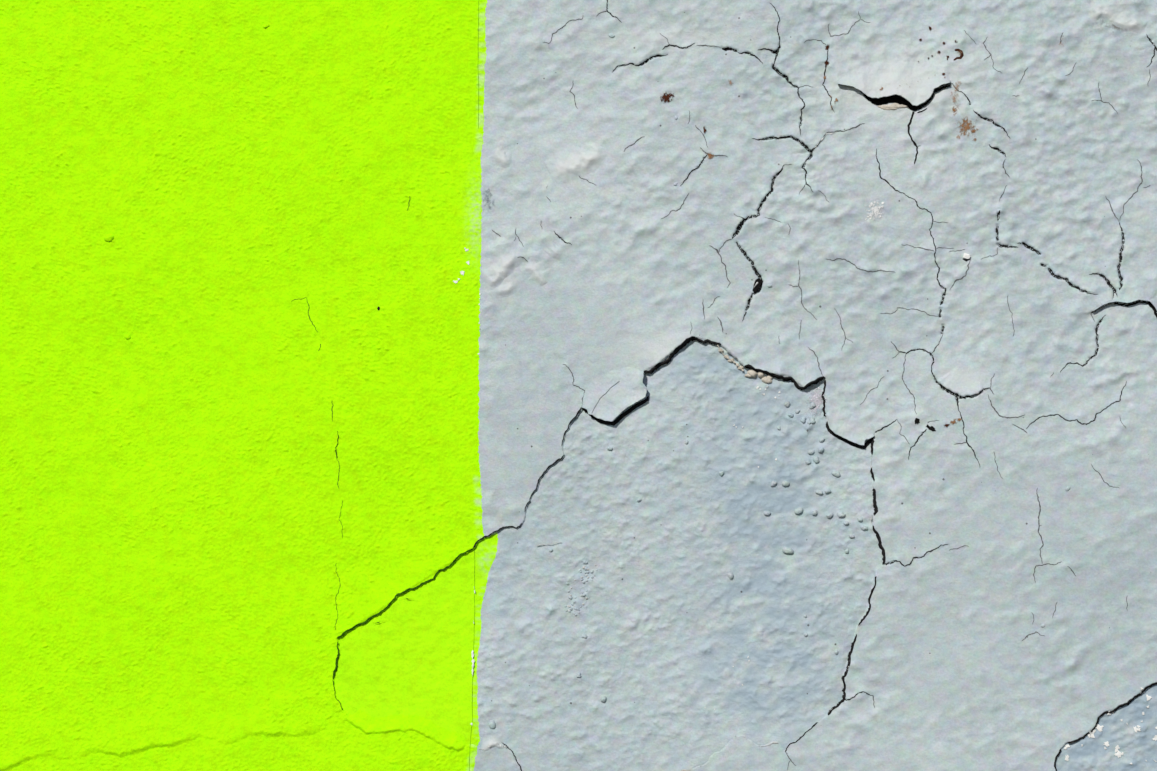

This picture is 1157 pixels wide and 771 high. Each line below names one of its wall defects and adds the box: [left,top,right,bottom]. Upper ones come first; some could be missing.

crack [474,74,482,129]
crack [545,0,622,44]
peeling [838,56,952,164]
crack [964,30,1028,96]
crack [613,3,870,374]
crack [827,83,1150,479]
spalling [333,336,886,771]
crack [886,544,969,566]
crack [1033,488,1076,583]
spalling [1054,682,1157,771]